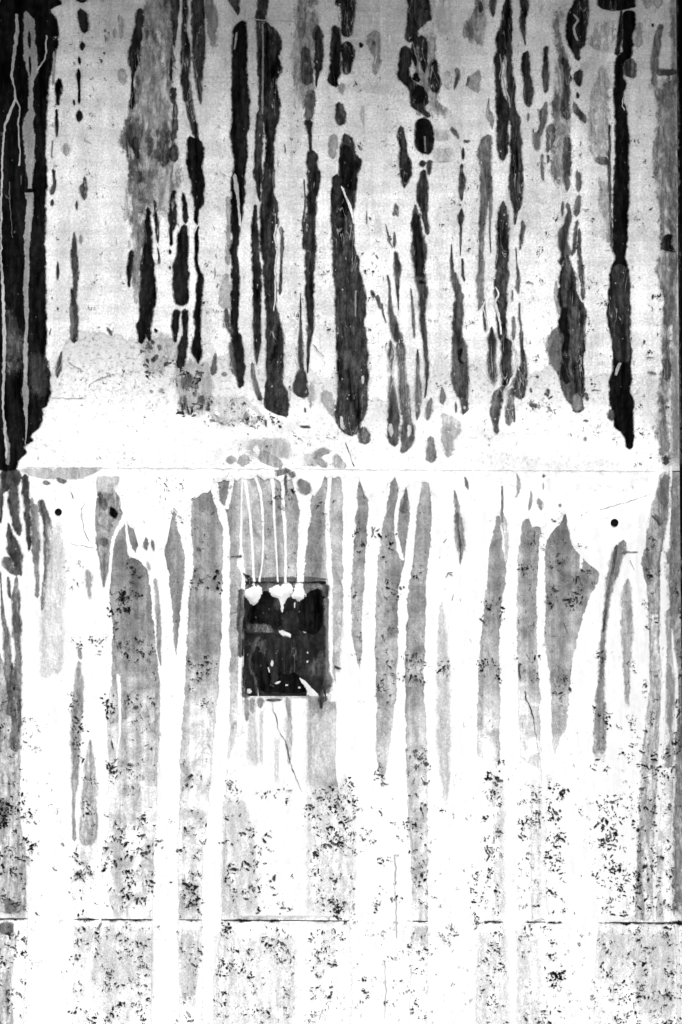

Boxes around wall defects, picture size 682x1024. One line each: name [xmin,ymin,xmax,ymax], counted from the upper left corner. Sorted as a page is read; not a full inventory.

damp [180,0,218,224]
damp [314,0,382,93]
damp [397,126,412,188]
damp [397,0,460,162]
damp [486,0,524,224]
damp [169,193,190,306]
damp [251,205,262,364]
damp [476,134,498,382]
damp [494,201,513,386]
damp [558,203,585,302]
damp [247,588,325,637]
crack [272,710,302,791]